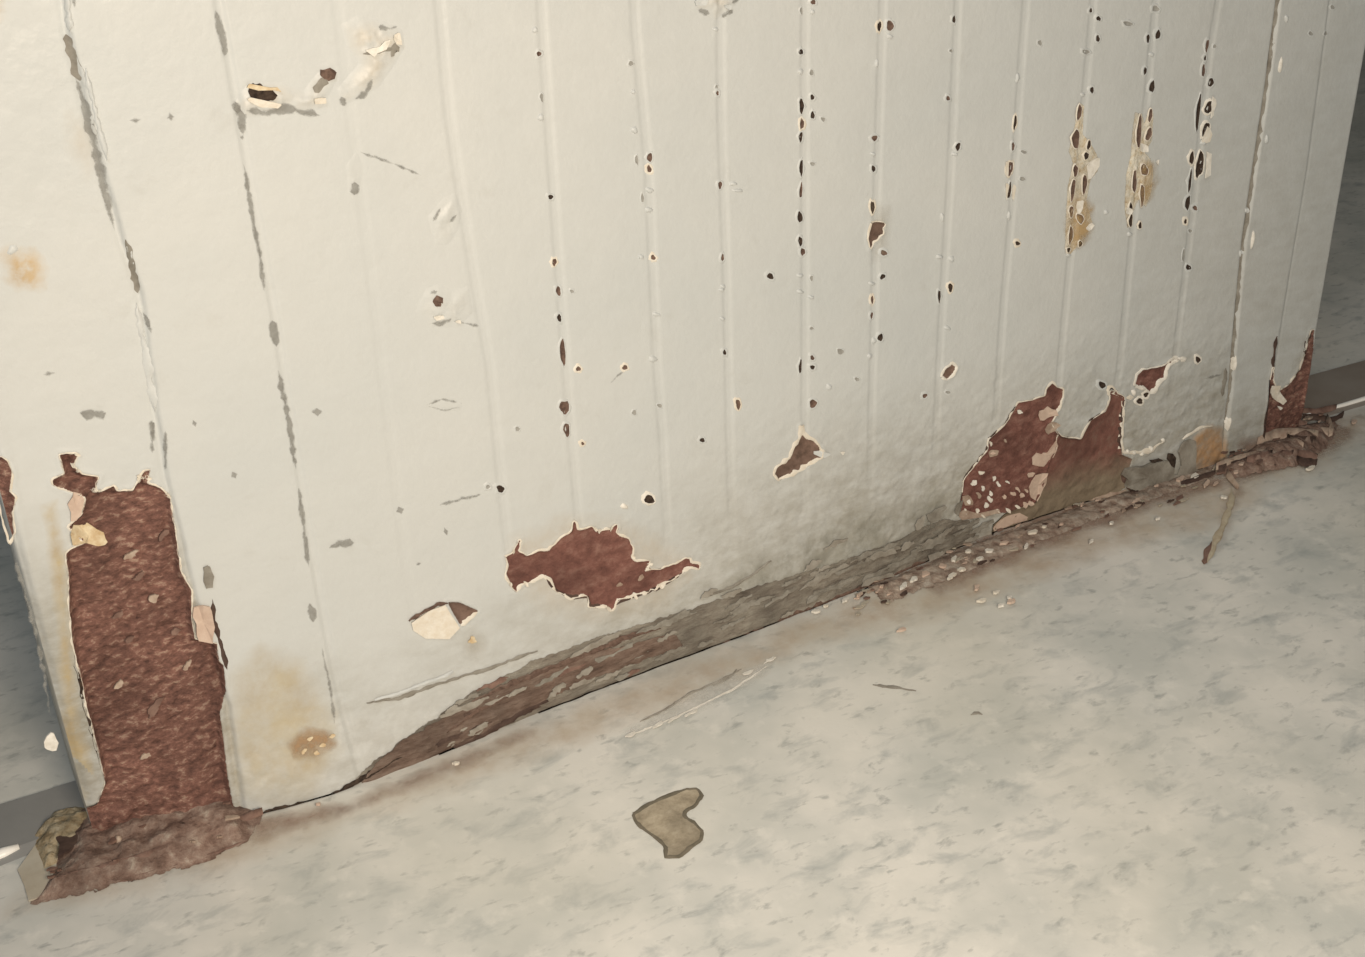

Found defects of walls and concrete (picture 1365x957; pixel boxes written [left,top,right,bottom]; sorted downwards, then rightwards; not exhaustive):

spalling [874,17,896,39]
spalling [795,46,826,299]
spalling [867,198,889,359]
spalling [936,281,954,305]
spalling [796,353,817,375]
spalling [483,481,507,495]
peeling [773,425,845,481]
peeling [811,353,1238,616]
leakage [1202,488,1235,564]
peeling [478,491,712,643]
peeling [409,602,478,644]
corrosion [0,329,1365,945]